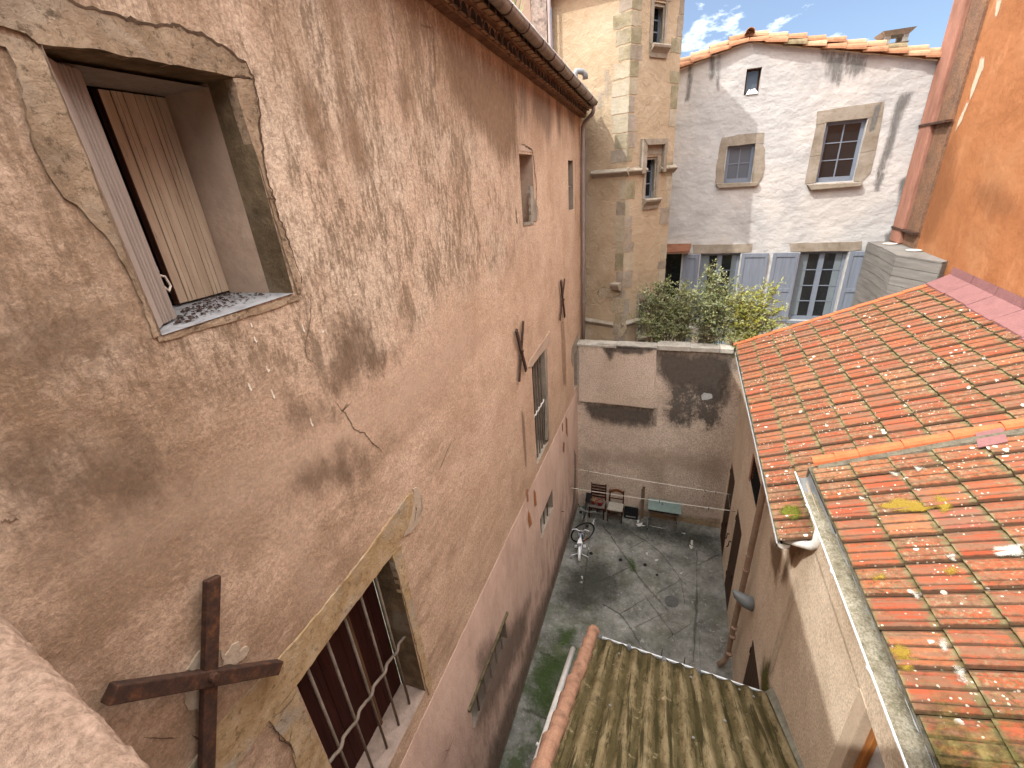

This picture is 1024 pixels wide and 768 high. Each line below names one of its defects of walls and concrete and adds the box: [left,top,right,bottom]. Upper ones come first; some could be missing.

water stain [869,105,880,131]
water stain [875,94,910,190]
crack [335,402,380,449]
water stain [605,346,733,430]